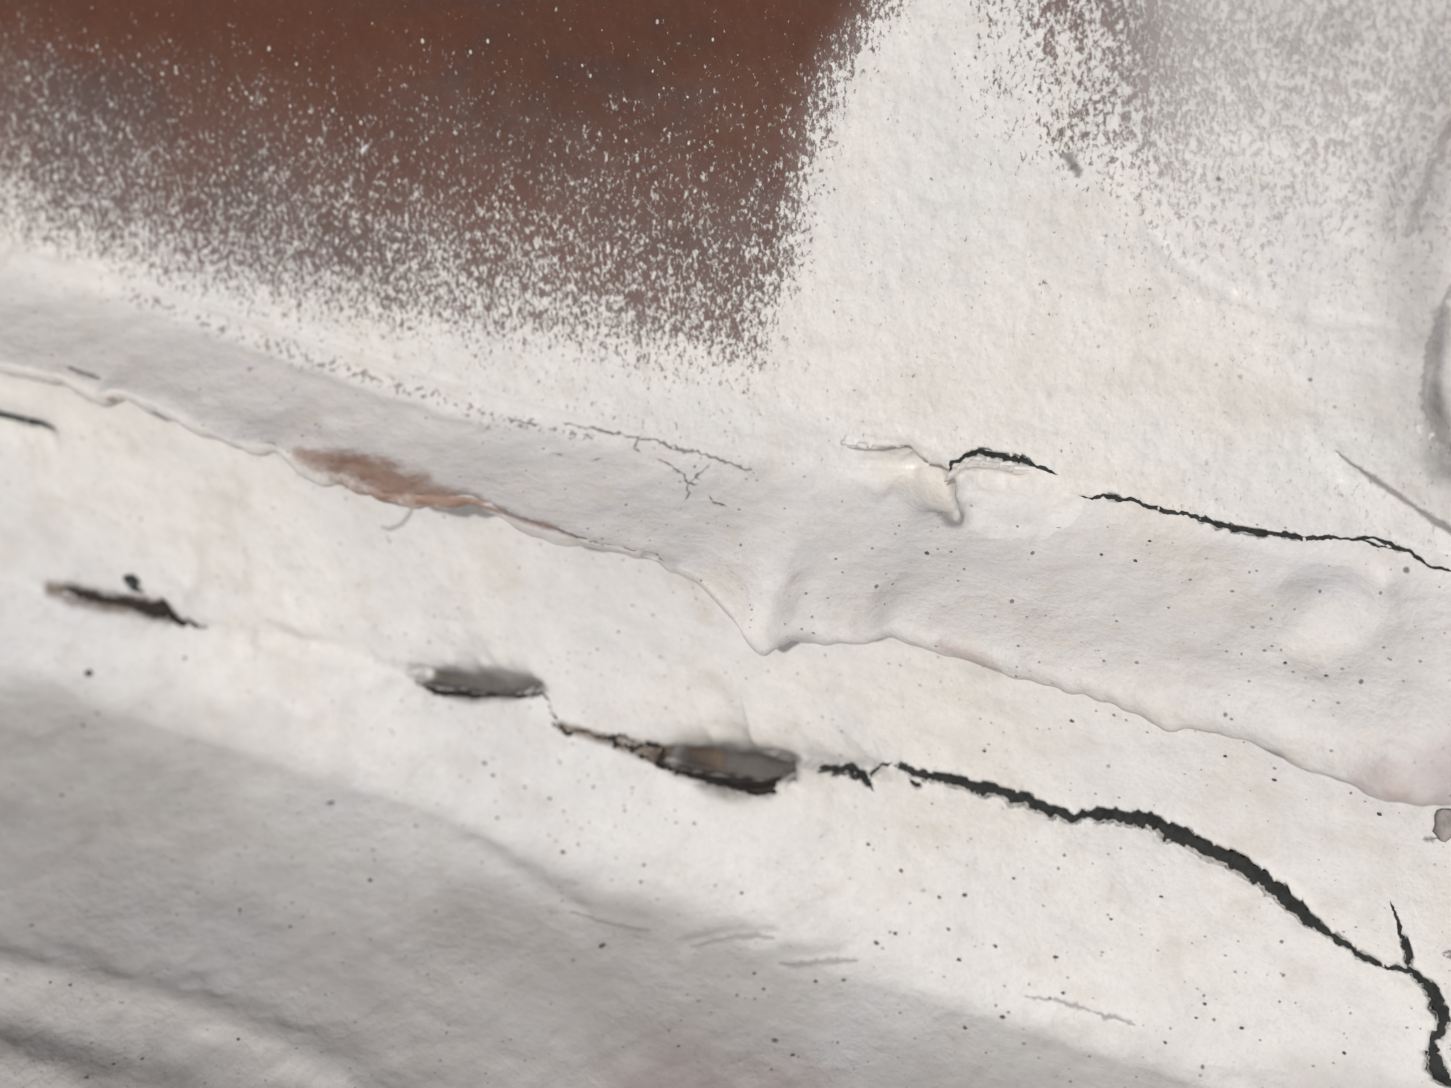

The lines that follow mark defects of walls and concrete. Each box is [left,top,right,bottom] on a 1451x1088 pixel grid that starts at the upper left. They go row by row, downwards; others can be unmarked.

crack [0,412,58,435]
rust [298,451,508,516]
crack [848,446,1451,572]
crack [60,586,207,629]
crack [547,704,684,775]
peeling [774,760,815,801]
crack [818,762,1451,1087]